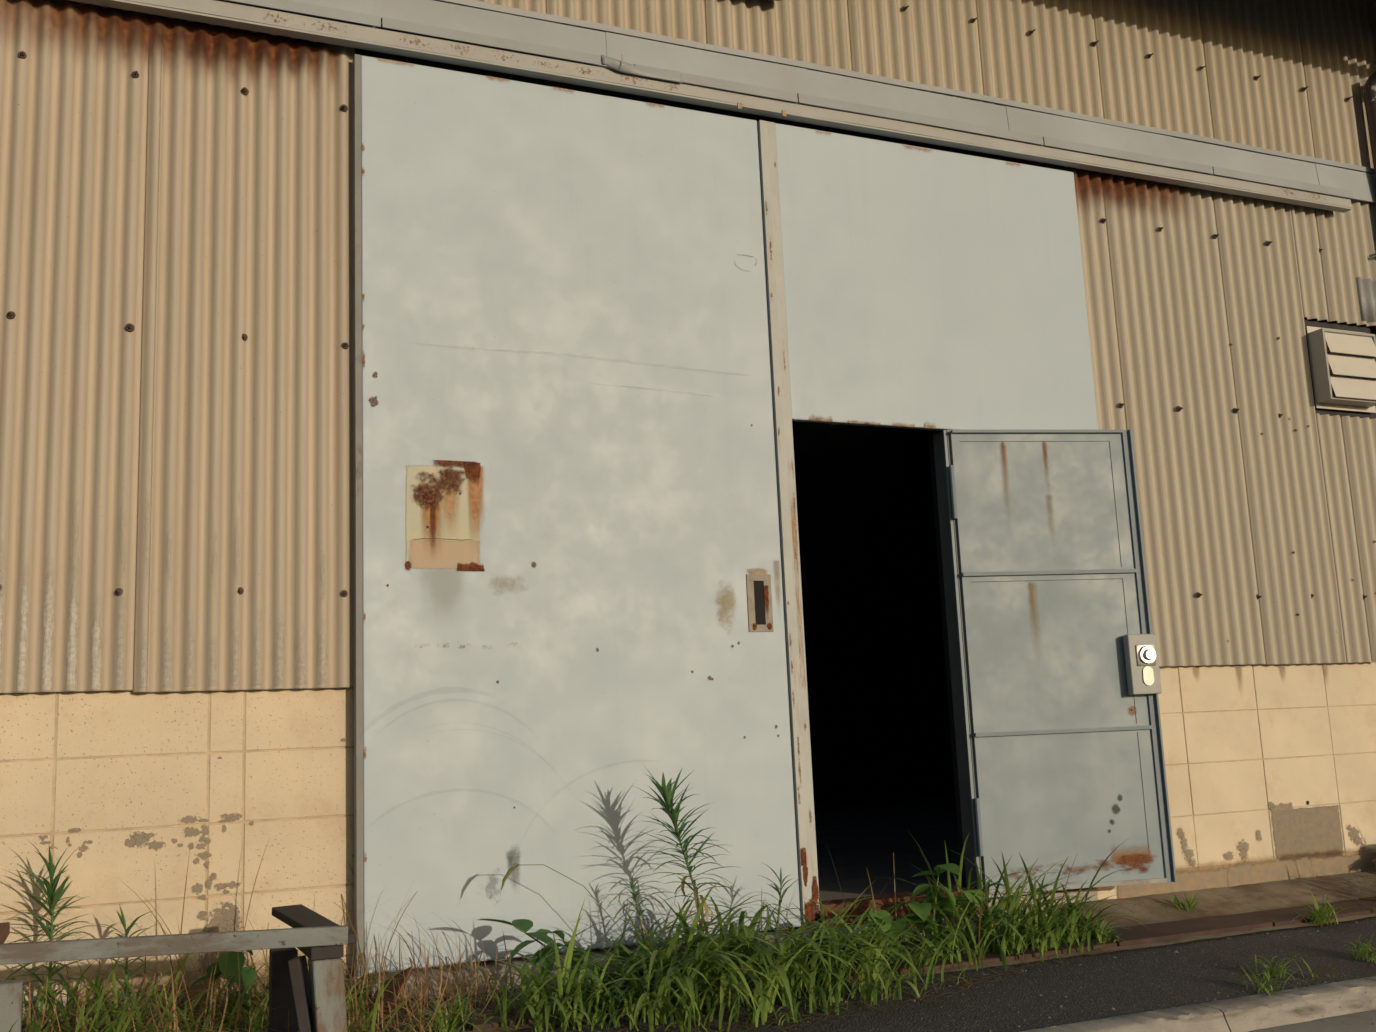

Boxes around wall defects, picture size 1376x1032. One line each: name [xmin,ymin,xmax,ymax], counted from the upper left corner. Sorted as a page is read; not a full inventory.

rust [0,0,337,68]
rust [1007,160,1168,197]
spalling [125,813,254,933]
rust [1101,852,1152,872]
peeling [1117,802,1376,899]